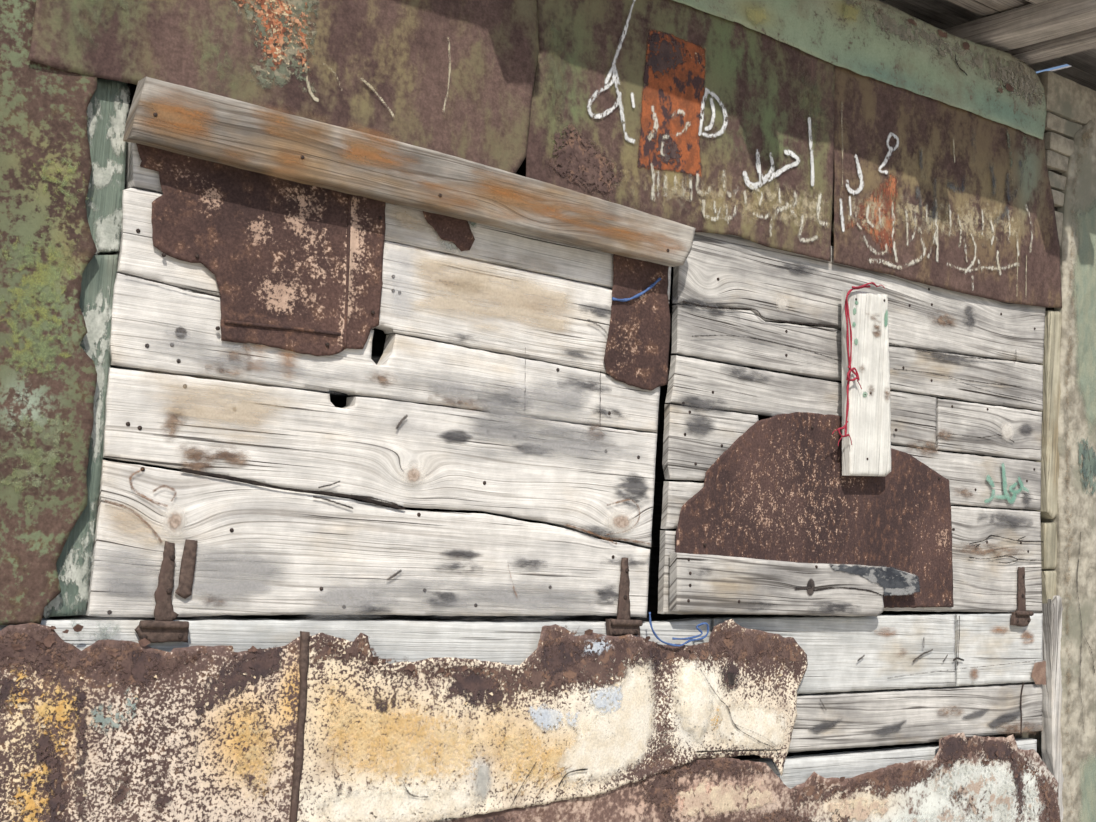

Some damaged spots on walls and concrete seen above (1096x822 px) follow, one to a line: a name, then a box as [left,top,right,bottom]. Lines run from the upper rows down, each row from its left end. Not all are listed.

corrosion [232,0,319,102]
corrosion [149,103,208,133]
corrosion [550,124,622,200]
corrosion [637,30,706,177]
corrosion [847,174,898,253]
crack [105,468,405,542]
crack [566,499,651,544]
corrosion [0,624,207,822]
corrosion [193,646,287,753]
corrosion [310,628,805,822]
corrosion [1031,661,1046,685]
corrosion [741,733,1059,822]